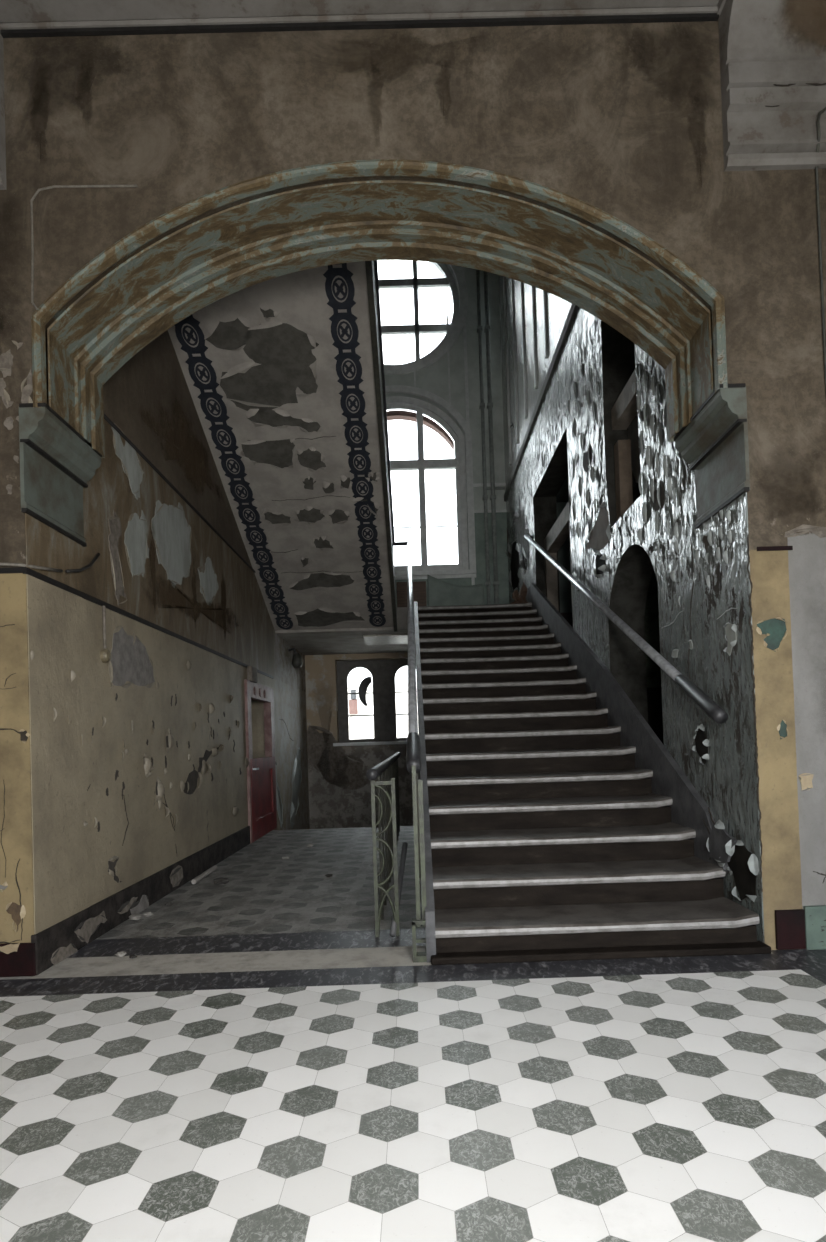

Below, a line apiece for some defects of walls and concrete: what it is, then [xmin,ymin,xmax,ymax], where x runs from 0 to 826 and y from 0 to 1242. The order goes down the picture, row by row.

peeling [0,340,33,430]
peeling [108,423,219,606]
peeling [204,302,380,591]
peeling [294,608,365,627]
spalling [505,541,527,590]
peeling [567,365,610,579]
peeling [632,364,732,607]
peeling [723,622,737,656]
peeling [756,617,787,652]
peeling [144,695,249,827]
crack [0,785,23,943]
spalling [0,882,26,954]